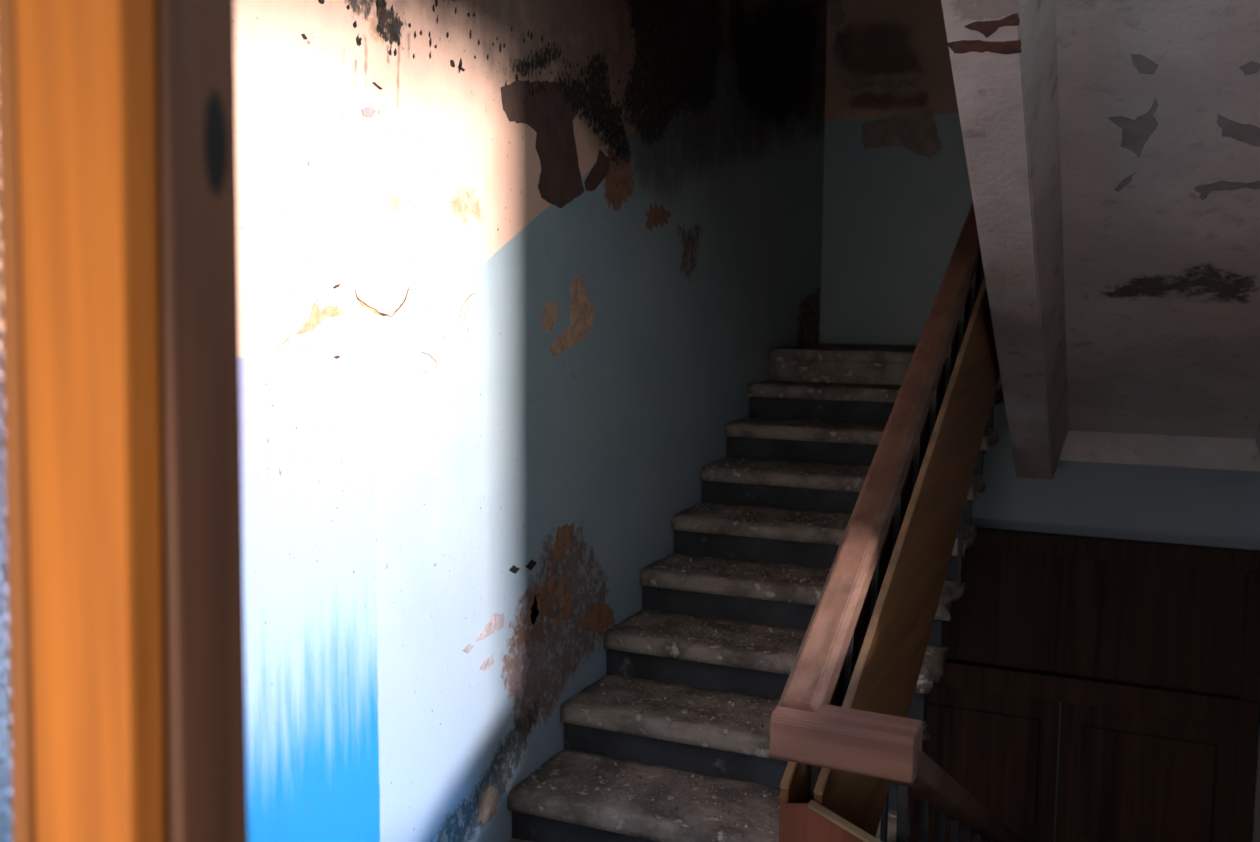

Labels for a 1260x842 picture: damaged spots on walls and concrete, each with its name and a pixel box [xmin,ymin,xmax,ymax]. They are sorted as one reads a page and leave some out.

peeling [501,80,634,212]
peeling [274,302,343,349]
peeling [541,275,595,356]